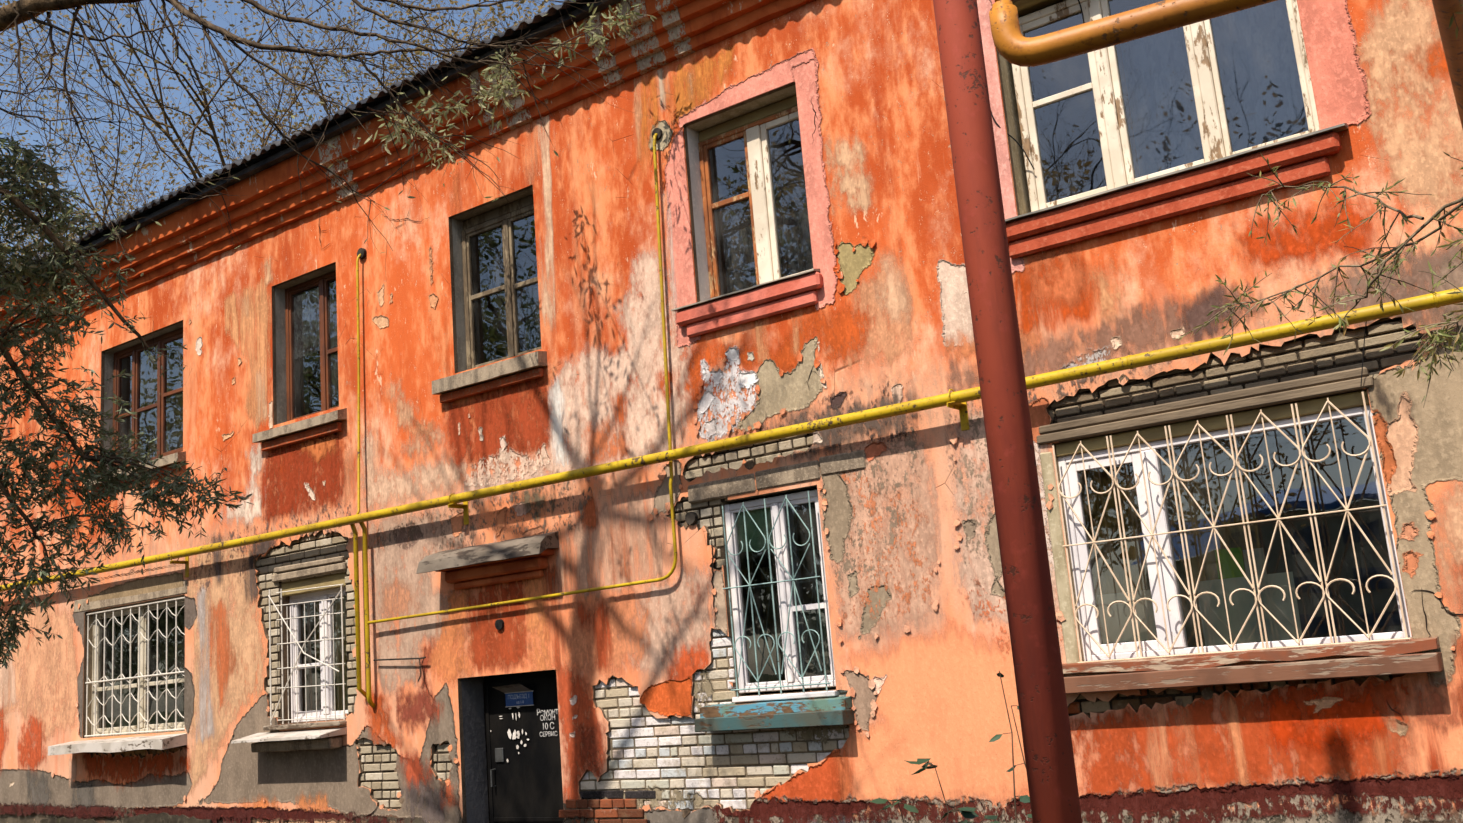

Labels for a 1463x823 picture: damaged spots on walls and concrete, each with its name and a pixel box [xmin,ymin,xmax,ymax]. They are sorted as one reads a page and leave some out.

peeling [833,239,876,293]
flaking render [648,346,1010,653]
flaking render [1029,317,1423,641]
peeling [1425,510,1437,539]
flaking render [256,531,405,810]
flaking render [432,741,465,788]
flaking render [559,588,878,823]